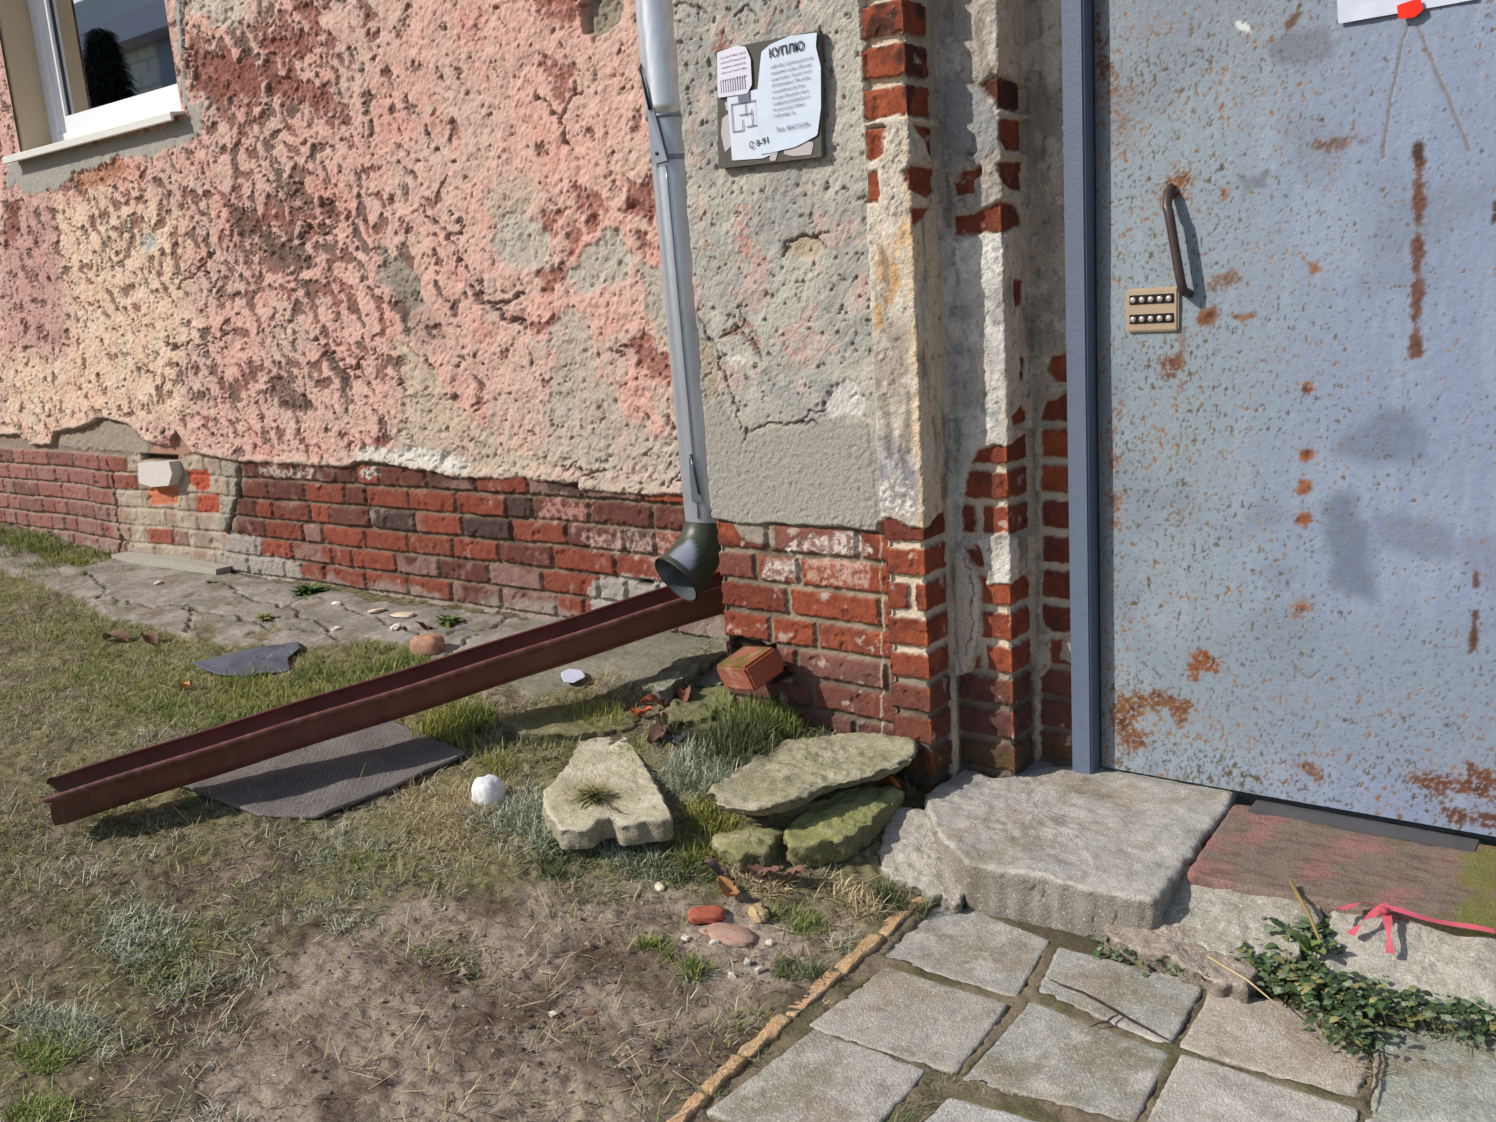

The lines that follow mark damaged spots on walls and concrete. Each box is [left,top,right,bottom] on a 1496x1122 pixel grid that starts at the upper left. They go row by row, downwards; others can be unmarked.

spalling [524,0,624,38]
spalling [857,0,1029,239]
crack [780,230,830,258]
spalling [1013,278,1025,309]
rust [1406,138,1432,362]
crack [696,304,827,442]
spalling [638,578,654,587]
spalling [877,351,1073,794]
rust [1107,646,1225,760]
rust [1401,756,1496,832]